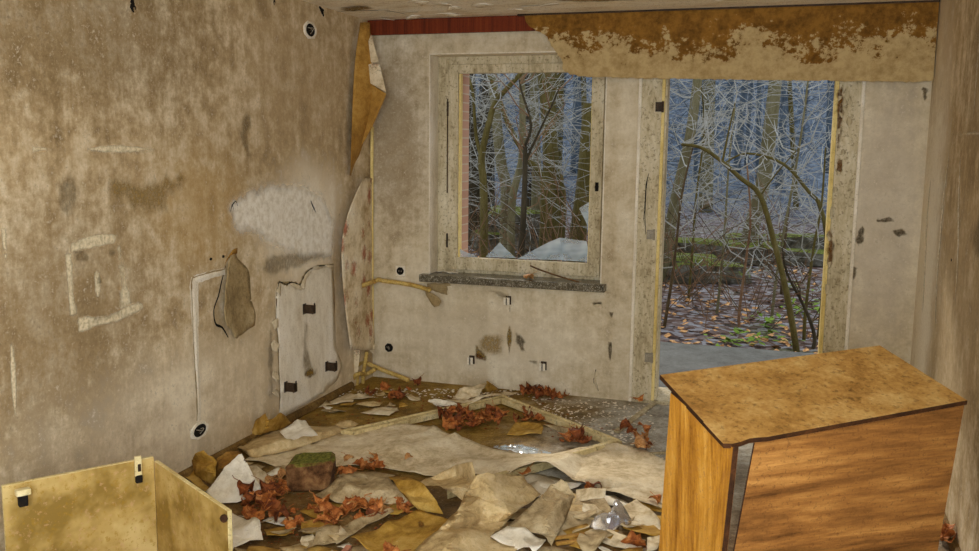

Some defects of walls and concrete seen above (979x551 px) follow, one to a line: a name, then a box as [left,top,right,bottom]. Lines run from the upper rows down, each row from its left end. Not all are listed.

peeling [231,185,342,416]